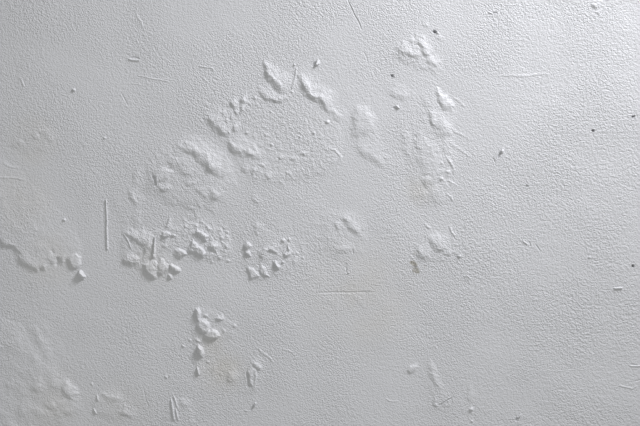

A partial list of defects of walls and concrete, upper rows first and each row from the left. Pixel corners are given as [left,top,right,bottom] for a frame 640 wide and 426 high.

peeling [118,213,234,281]
peeling [181,305,239,377]